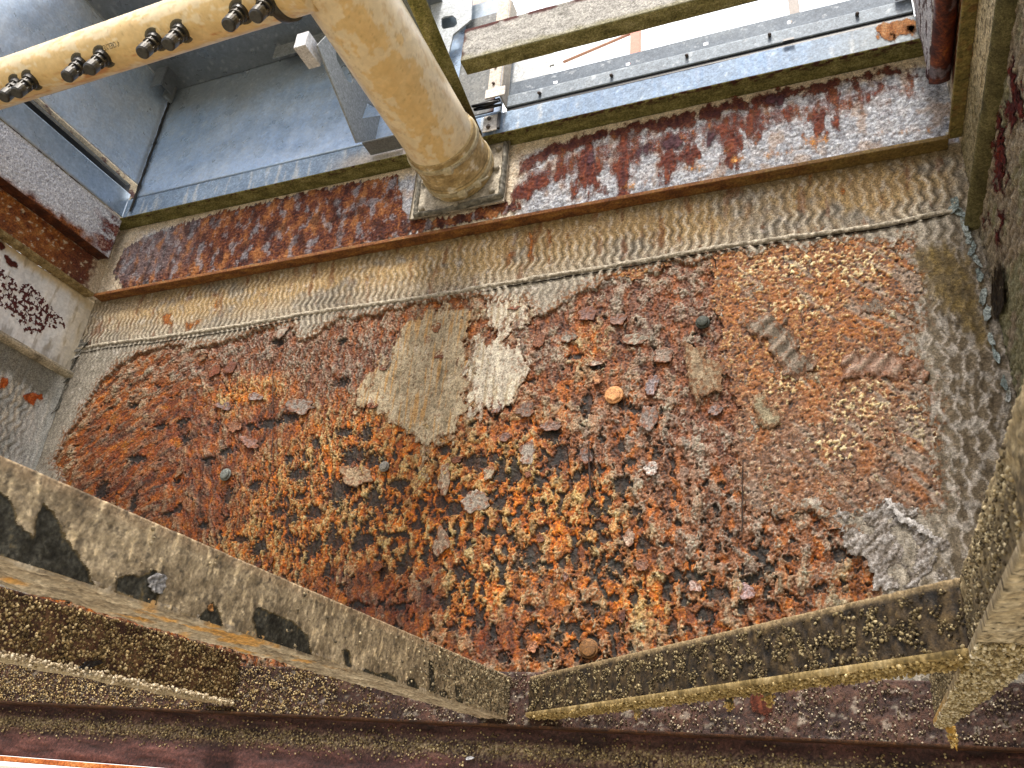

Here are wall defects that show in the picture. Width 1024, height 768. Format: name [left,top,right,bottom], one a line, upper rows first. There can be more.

rust [0,241,65,334]
rust [113,64,919,288]
rust [982,205,1005,253]
rust [990,56,1024,197]
rust [23,392,43,406]
peeling [353,293,540,487]
rust [30,230,942,672]